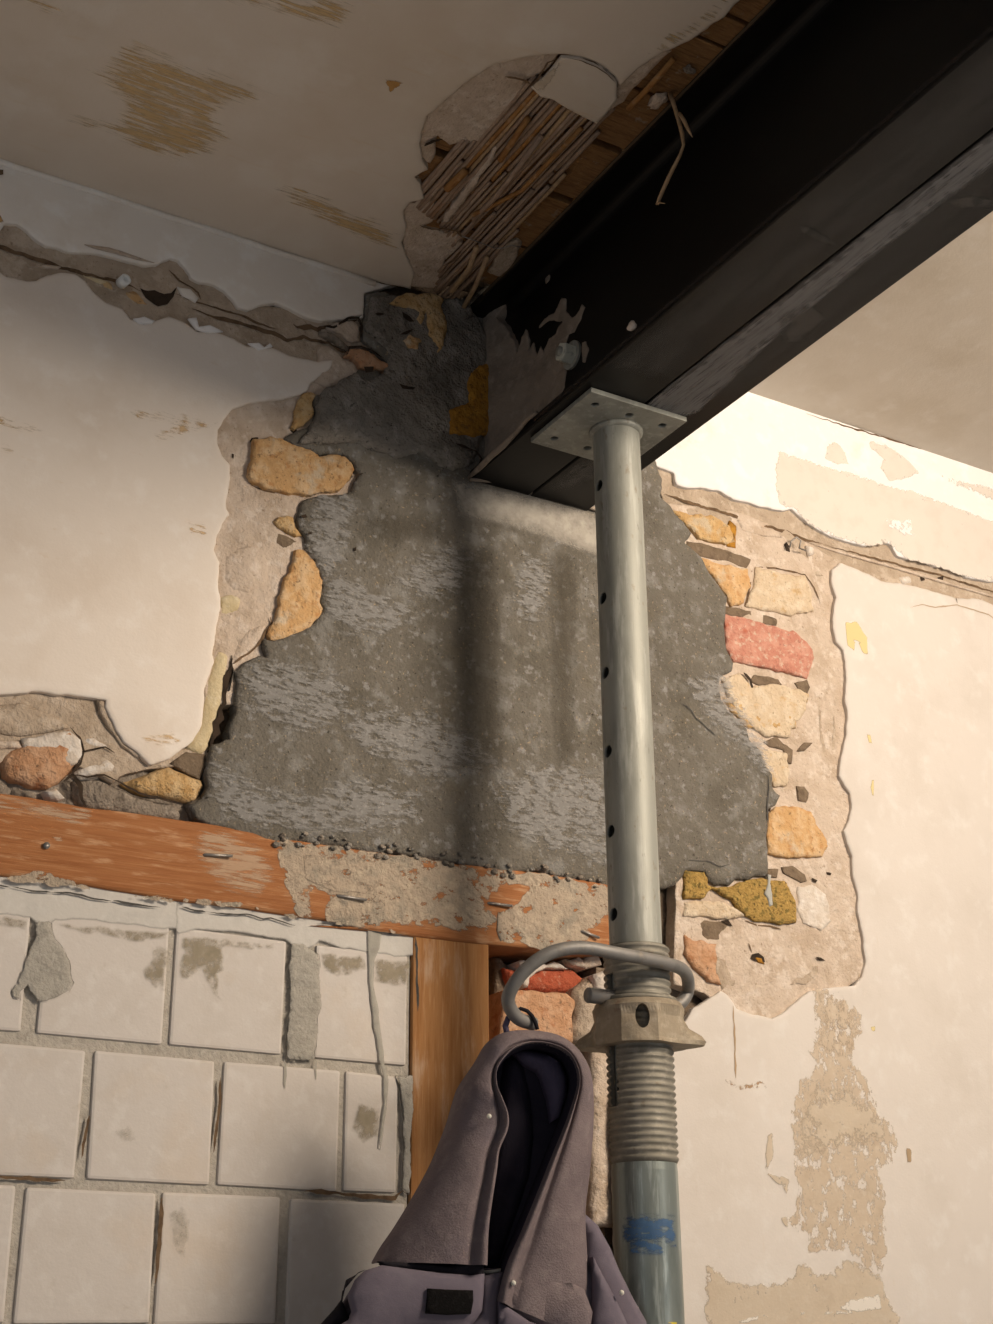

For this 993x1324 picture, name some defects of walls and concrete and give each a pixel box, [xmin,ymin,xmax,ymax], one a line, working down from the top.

flaking render [0,216,388,821]
flaking render [449,364,489,438]
flaking render [390,49,671,353]
flaking render [658,441,993,1324]